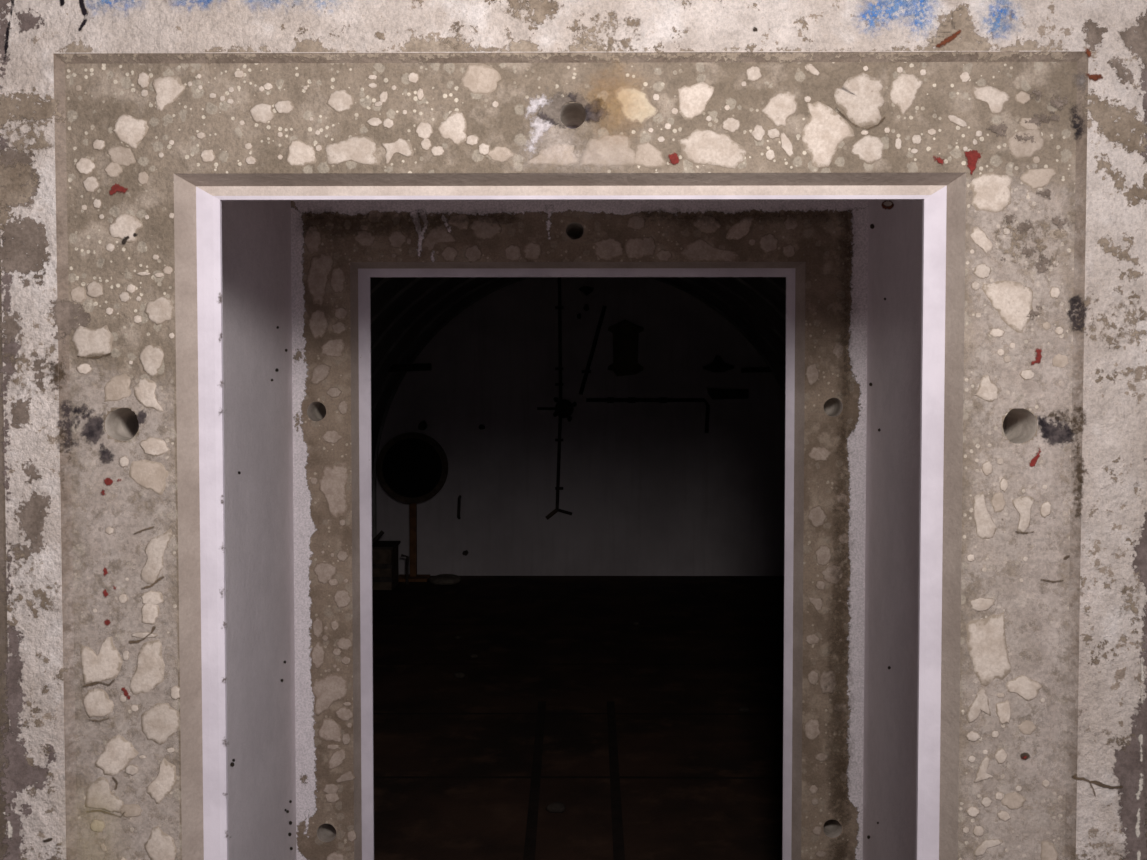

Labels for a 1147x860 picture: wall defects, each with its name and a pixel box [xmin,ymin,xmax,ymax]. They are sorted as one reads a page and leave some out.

spalling [57,0,1147,363]
spalling [0,0,180,860]
peeling [271,200,881,860]
spalling [974,374,999,402]
spalling [973,458,1052,539]
peeling [1095,367,1134,384]
spalling [965,598,1046,783]
peeling [1040,512,1147,860]
spalling [962,785,1026,857]
crack [1072,774,1123,795]